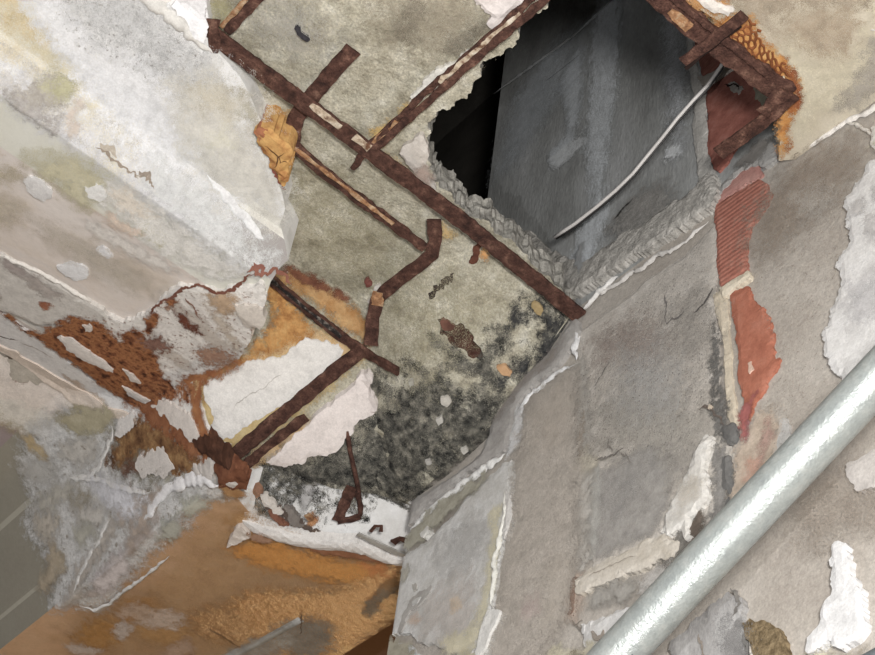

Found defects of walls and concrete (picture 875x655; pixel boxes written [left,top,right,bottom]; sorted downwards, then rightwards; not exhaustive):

corrosion [0,263,372,501]
damp [14,249,569,655]
spalling [42,0,576,302]
spalling [57,76,569,505]
peeling [226,460,517,655]
corrosion [469,244,490,264]
corrosion [497,363,512,377]
corrosion [686,0,737,27]
flaking render [651,166,792,571]
corrosion [729,15,805,159]
peeling [805,541,872,655]
peeling [821,126,875,380]